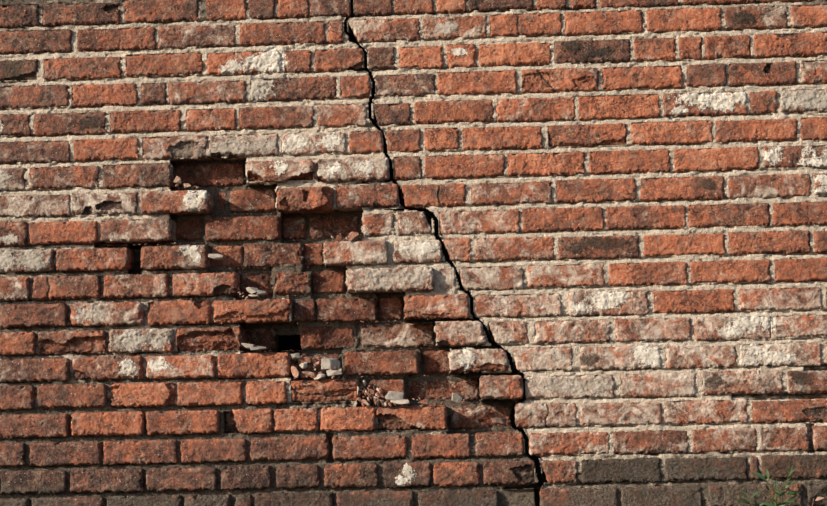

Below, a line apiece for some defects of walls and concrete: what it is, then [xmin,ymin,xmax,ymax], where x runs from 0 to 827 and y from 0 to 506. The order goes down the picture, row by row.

crack [536,70,556,93]
crack [344,0,546,506]
spalling [166,139,516,435]
spalling [110,384,126,407]
spalling [164,383,176,406]